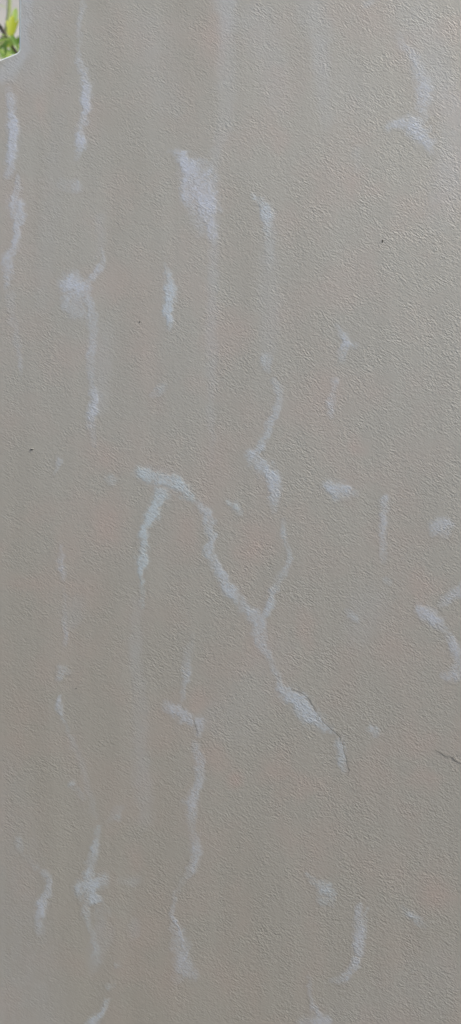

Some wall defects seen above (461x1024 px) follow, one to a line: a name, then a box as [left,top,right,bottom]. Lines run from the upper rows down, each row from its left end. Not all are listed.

damp [72,0,95,163]
damp [0,85,29,376]
damp [55,246,108,449]
damp [160,261,181,332]
damp [165,146,225,248]
damp [103,352,348,774]
damp [413,580,461,685]
damp [159,632,209,986]
crack [292,689,350,775]
damp [70,810,124,970]
damp [328,902,371,986]